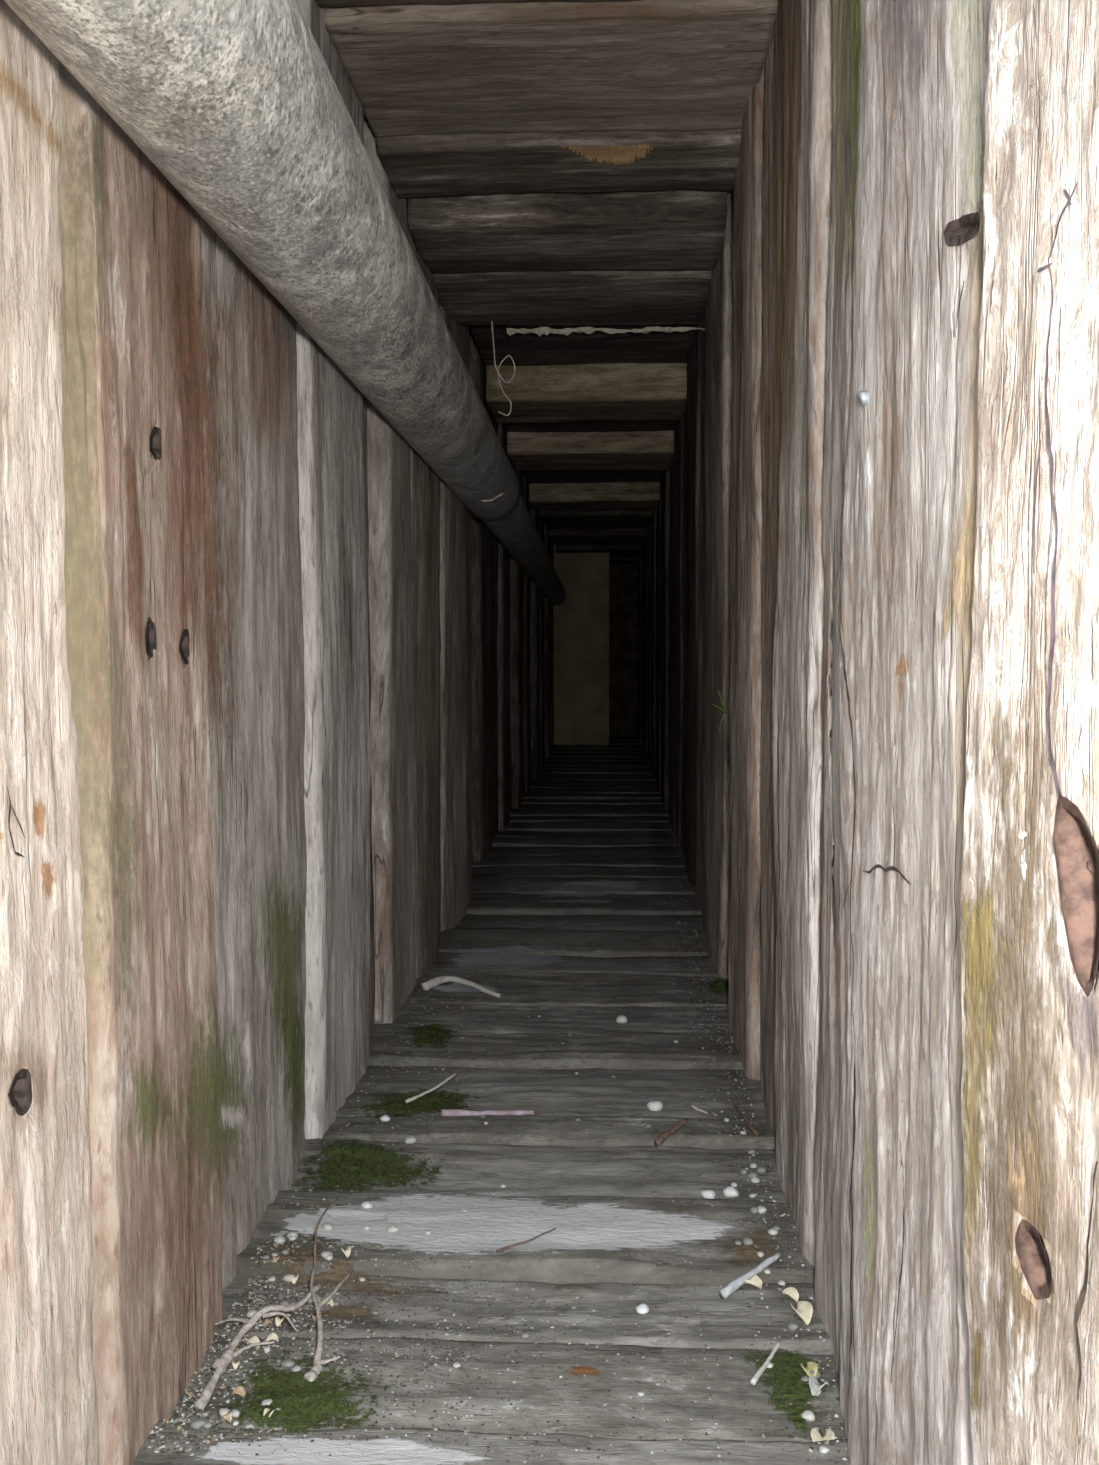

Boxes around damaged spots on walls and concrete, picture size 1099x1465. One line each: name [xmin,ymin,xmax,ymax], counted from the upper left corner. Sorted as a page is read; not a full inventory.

damp [0,74,61,150]
crack [1033,182,1078,799]
crack [830,465,912,1442]